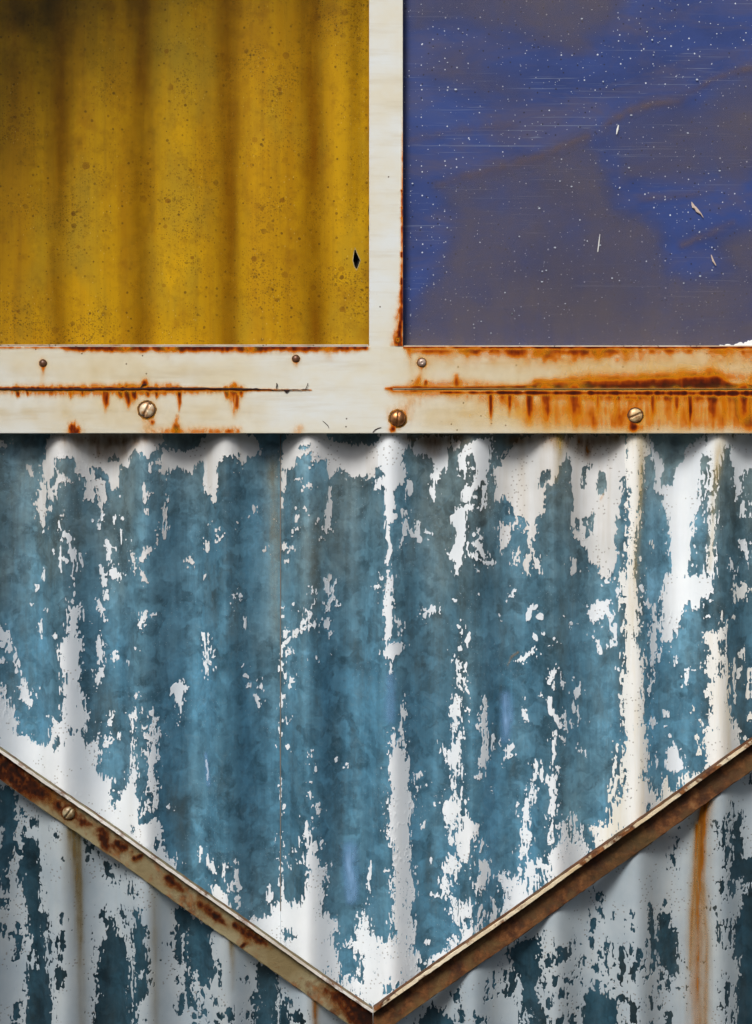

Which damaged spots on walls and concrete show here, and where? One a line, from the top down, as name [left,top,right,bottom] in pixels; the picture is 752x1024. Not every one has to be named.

corrosion [0,379,311,433]
corrosion [0,347,368,364]
corrosion [385,137,752,455]
peeling [0,434,263,869]
peeling [197,434,752,1024]
corrosion [0,753,143,941]
peeling [0,784,309,1024]
corrosion [163,874,184,892]
corrosion [197,900,268,950]
corrosion [313,986,372,1024]
corrosion [691,801,711,1024]